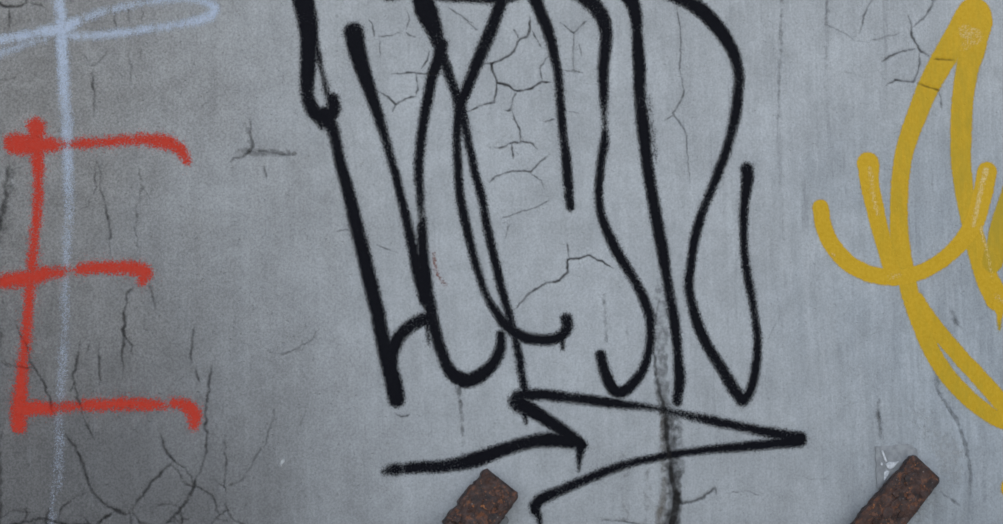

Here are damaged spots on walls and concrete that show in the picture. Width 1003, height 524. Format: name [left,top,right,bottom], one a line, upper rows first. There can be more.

crack [476,22,548,180]
crack [532,255,610,292]
rust [442,469,518,524]
crack [663,404,705,524]
rust [850,455,940,524]